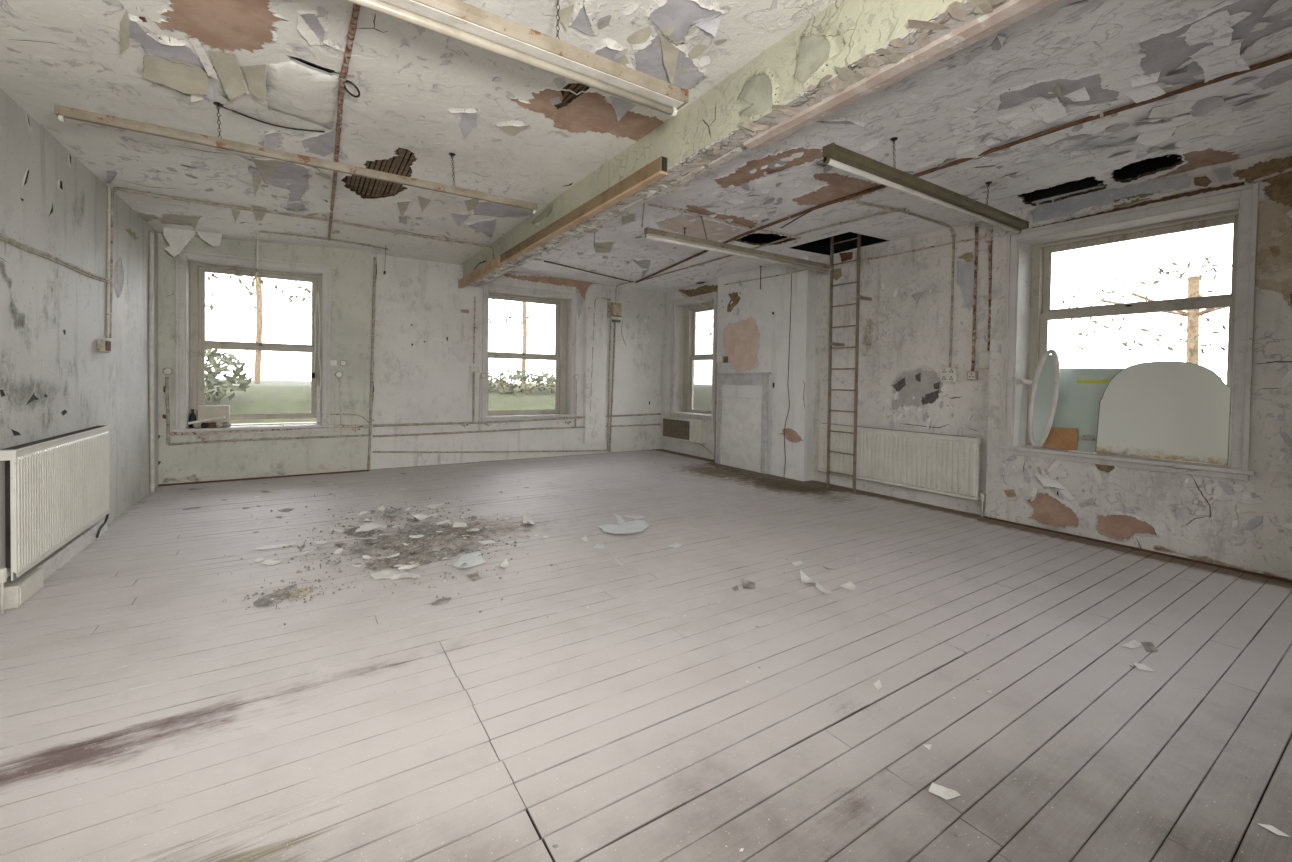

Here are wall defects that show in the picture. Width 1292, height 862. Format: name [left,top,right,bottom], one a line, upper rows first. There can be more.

flaking render [119,0,377,239]
peeling [445,108,481,138]
peeling [392,196,431,235]
peeling [429,199,556,244]
flaking render [678,280,761,372]
peeling [884,365,973,430]
flaking render [1001,455,1163,544]